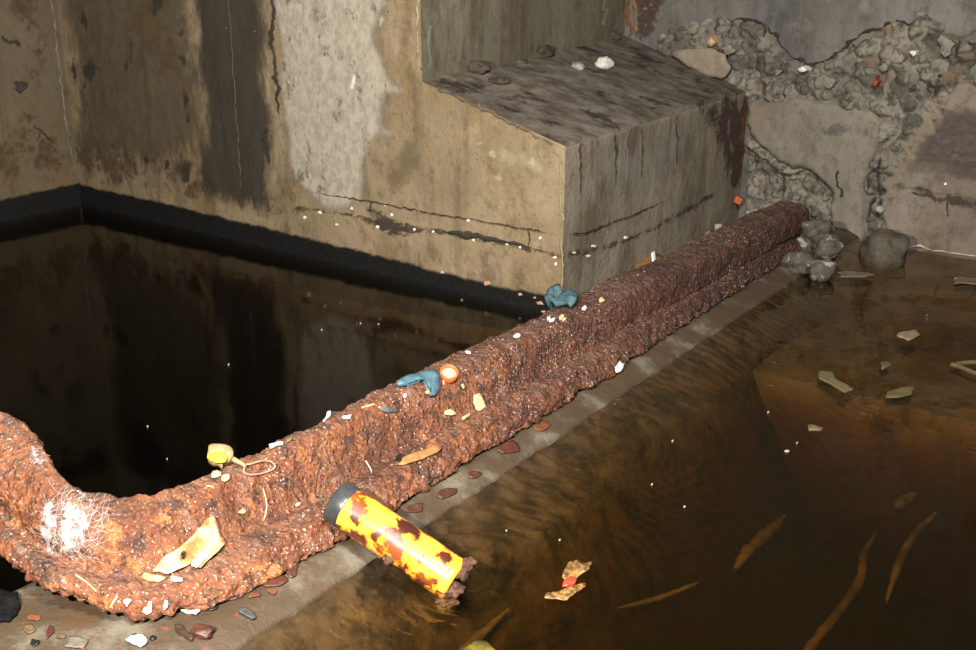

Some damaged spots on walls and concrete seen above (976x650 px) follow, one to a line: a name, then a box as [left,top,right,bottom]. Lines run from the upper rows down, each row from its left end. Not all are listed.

rust [625,0,662,40]
spalling [657,11,976,240]
leakage [0,0,549,329]
crack [315,192,546,245]
leakage [295,192,713,266]
crack [569,203,658,235]
crack [742,144,843,197]
crack [867,158,883,218]
leakage [897,182,976,216]
rust [437,488,457,499]
rust [208,568,297,611]